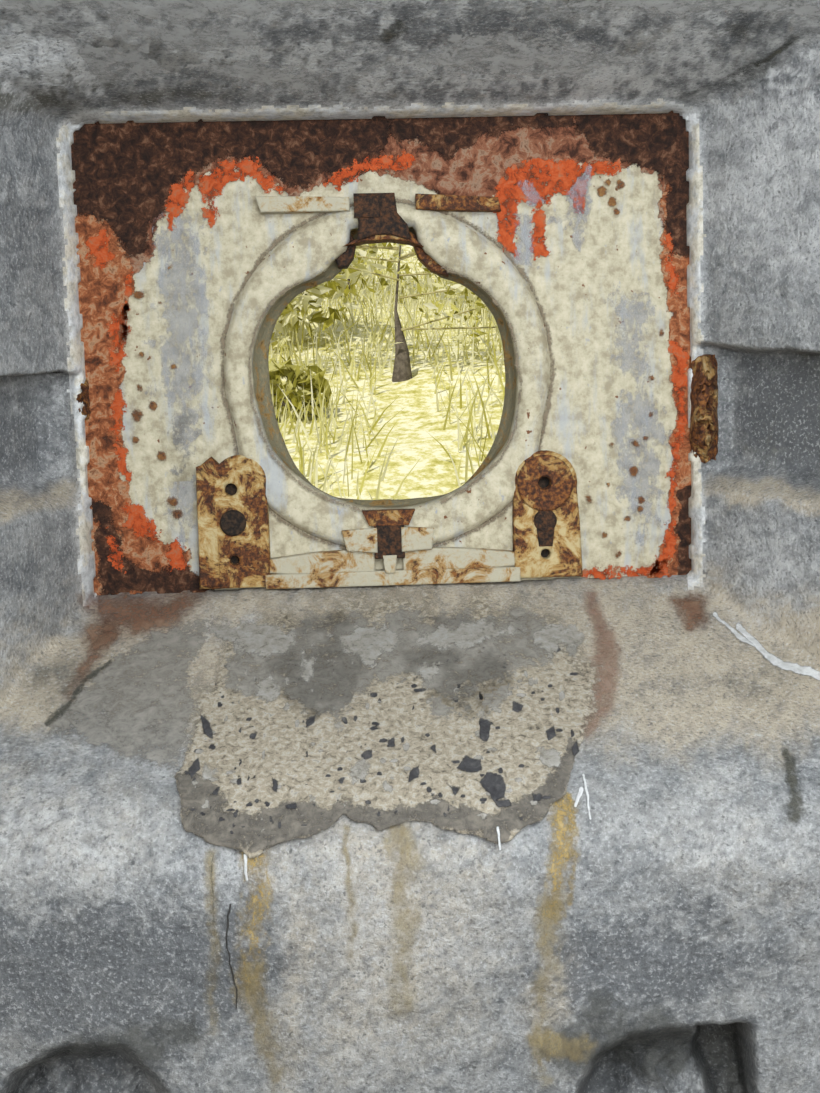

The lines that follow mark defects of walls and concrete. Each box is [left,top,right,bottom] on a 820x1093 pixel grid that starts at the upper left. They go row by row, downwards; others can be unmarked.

rust [597,179,625,215]
peeling [71,111,692,596]
rust [131,401,157,422]
rust [167,497,182,519]
spalling [45,583,604,859]
damp [534,996,694,1082]